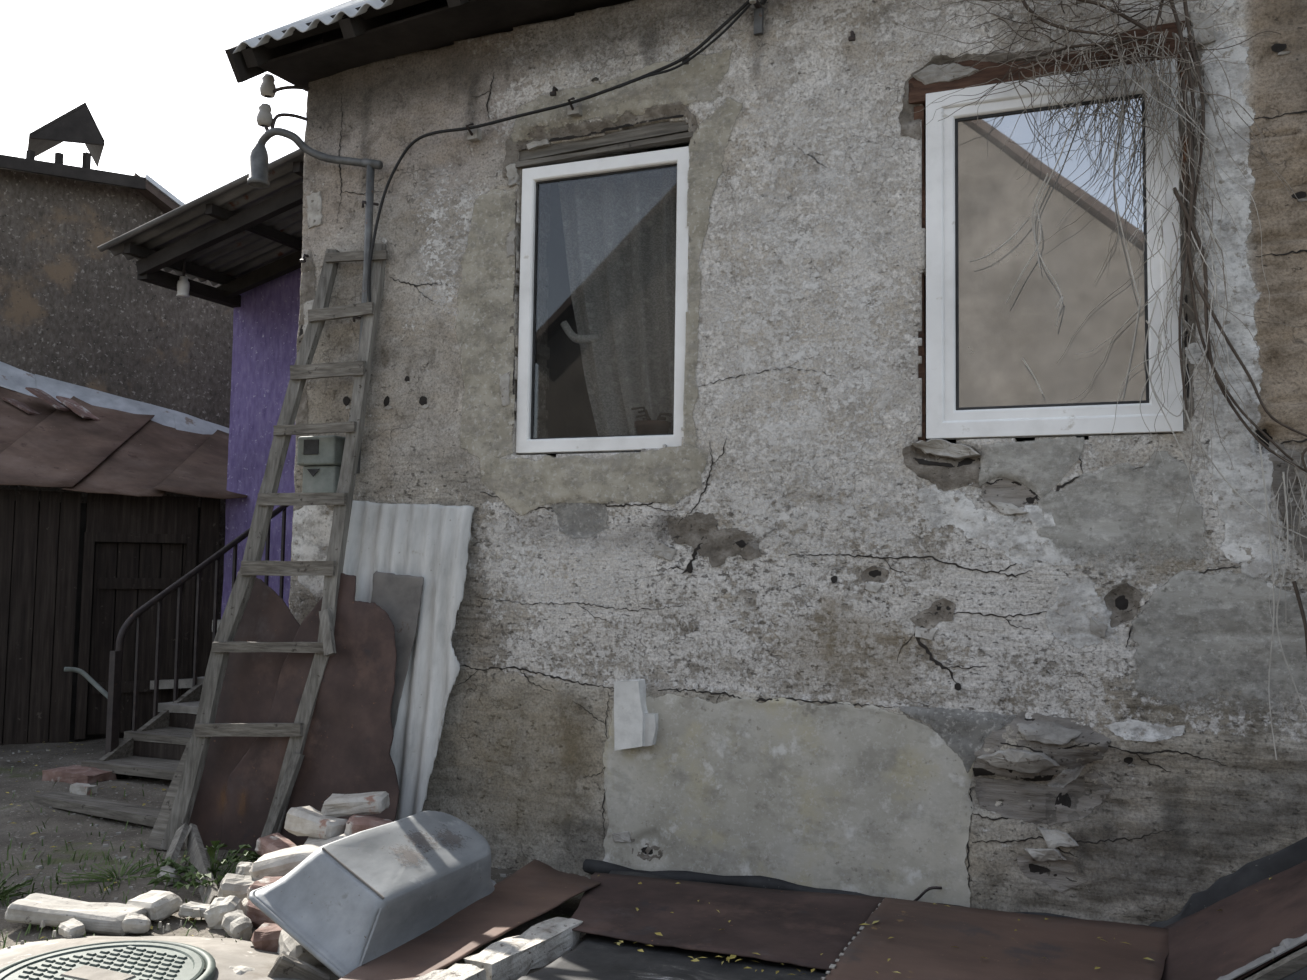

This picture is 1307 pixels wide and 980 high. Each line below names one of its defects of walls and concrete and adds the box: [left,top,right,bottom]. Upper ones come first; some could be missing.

spalling [898,39,1119,140]
crack [1256,249,1307,257]
crack [480,597,681,620]
crack [597,438,727,574]
crack [788,553,1036,577]
peeling [902,439,1142,653]
crack [897,582,1167,687]
crack [658,688,895,708]
spalling [972,712,1185,893]